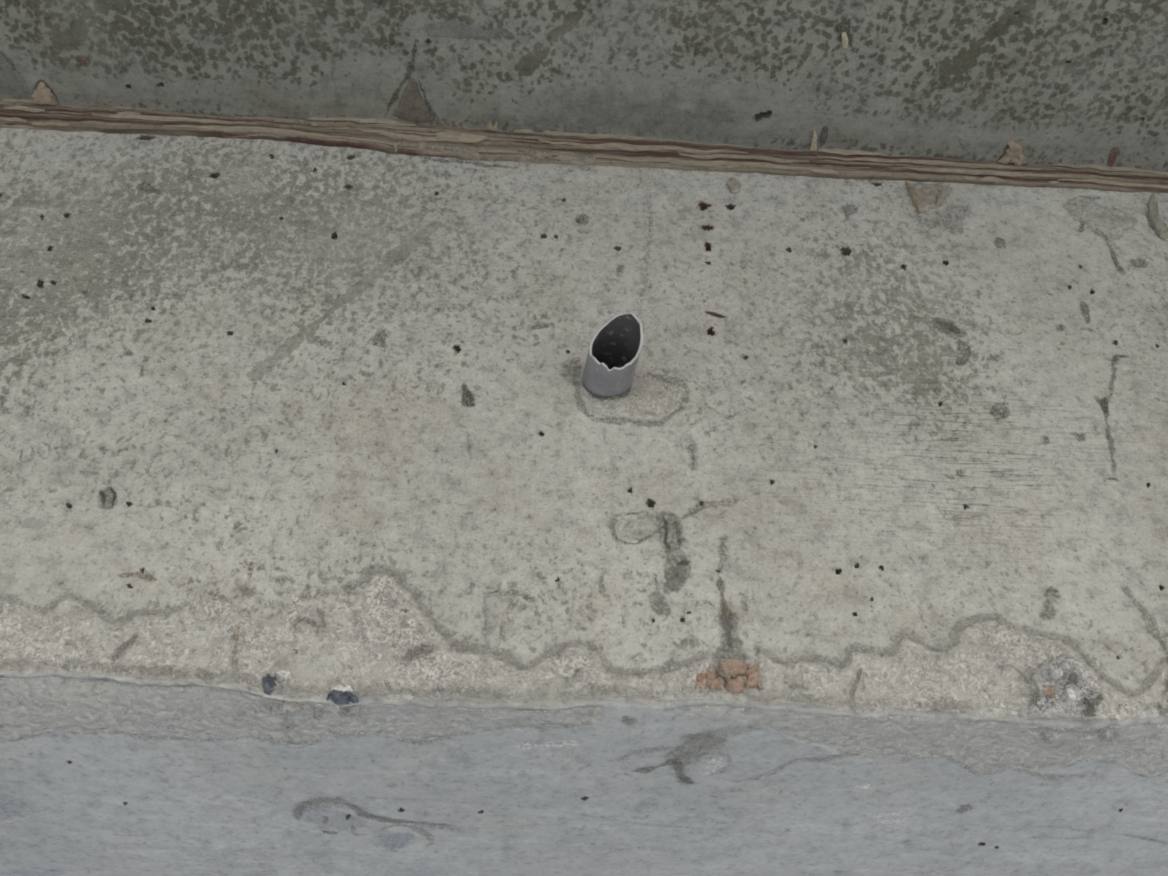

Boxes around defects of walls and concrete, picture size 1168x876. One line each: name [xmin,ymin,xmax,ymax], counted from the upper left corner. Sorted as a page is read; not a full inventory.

crack [1096,354,1127,481]
crack [708,537,748,659]
crack [1122,586,1168,659]